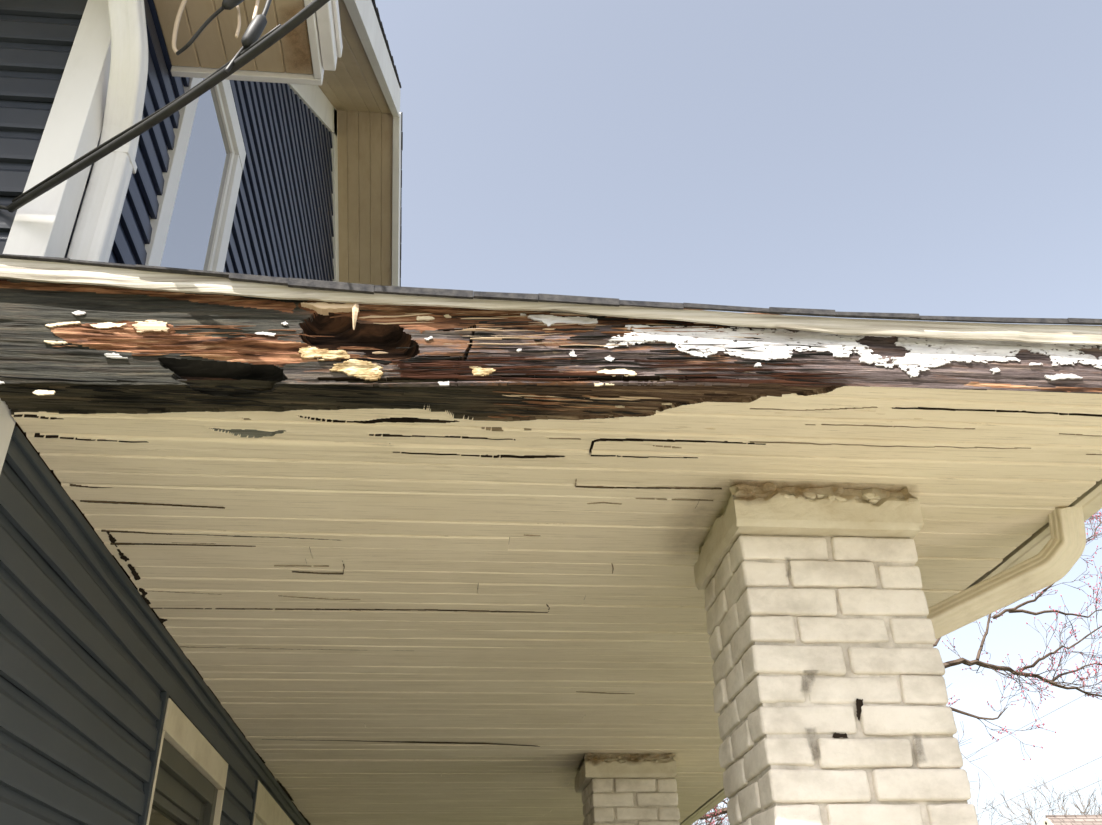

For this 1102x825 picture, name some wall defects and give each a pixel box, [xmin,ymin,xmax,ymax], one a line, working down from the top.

peeling [44,311,127,345]
spalling [255,312,433,365]
peeling [520,313,598,326]
peeling [594,325,1102,387]
spalling [159,358,288,396]
crack [300,406,1102,505]
crack [70,484,225,509]
spalling [734,483,847,501]
crack [101,530,550,613]
crack [179,644,342,652]
crack [576,688,635,696]
spalling [586,753,675,764]